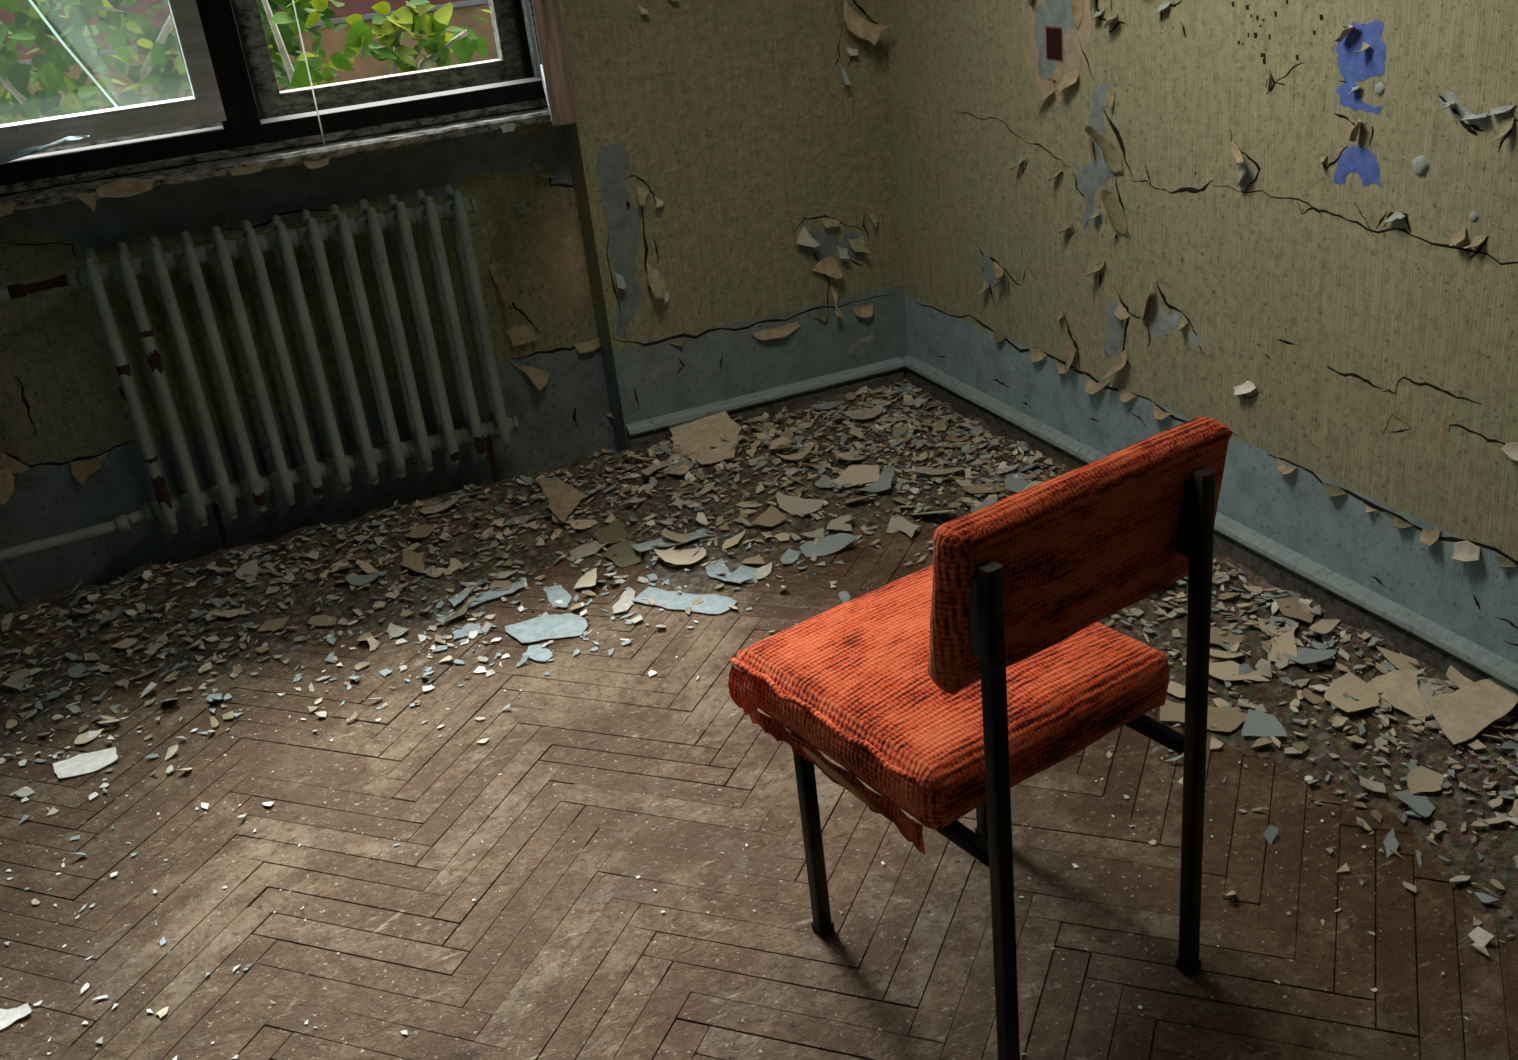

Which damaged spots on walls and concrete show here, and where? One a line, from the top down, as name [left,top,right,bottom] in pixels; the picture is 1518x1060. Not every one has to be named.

peeling [1152,0,1186,38]
peeling [1231,0,1288,64]
peeling [0,123,574,263]
crack [955,111,1019,137]
peeling [1009,0,1133,242]
peeling [1230,129,1261,192]
crack [1132,165,1518,265]
peeling [1318,20,1386,188]
crack [1057,310,1082,375]
peeling [1083,260,1203,381]
crack [1327,366,1506,445]
peeling [1501,442,1518,461]